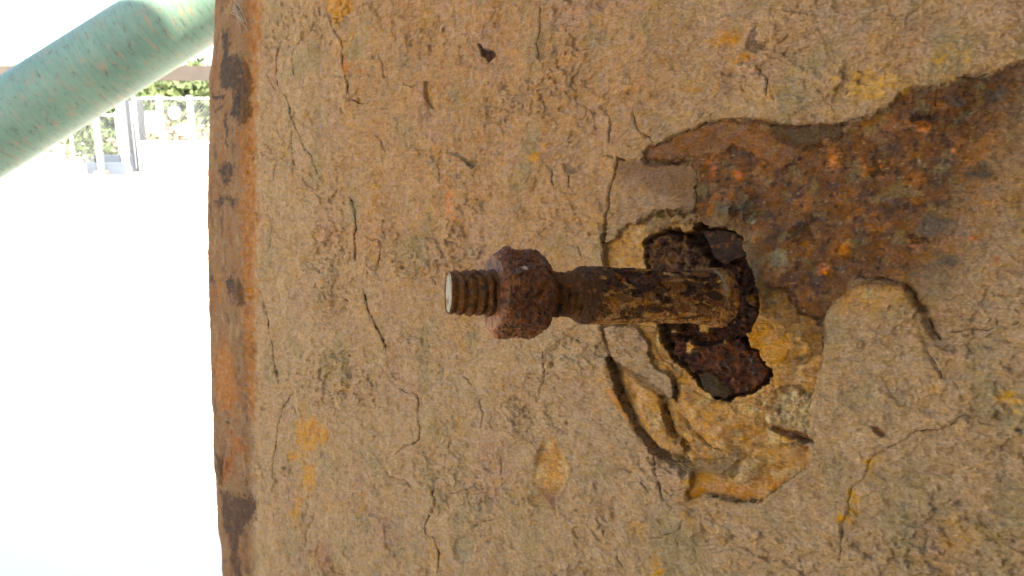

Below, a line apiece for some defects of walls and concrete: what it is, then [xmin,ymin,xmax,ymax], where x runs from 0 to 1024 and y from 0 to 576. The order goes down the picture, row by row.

rust [209,0,270,491]
crack [266,11,360,185]
spalling [597,55,1024,509]
rust [813,23,987,124]